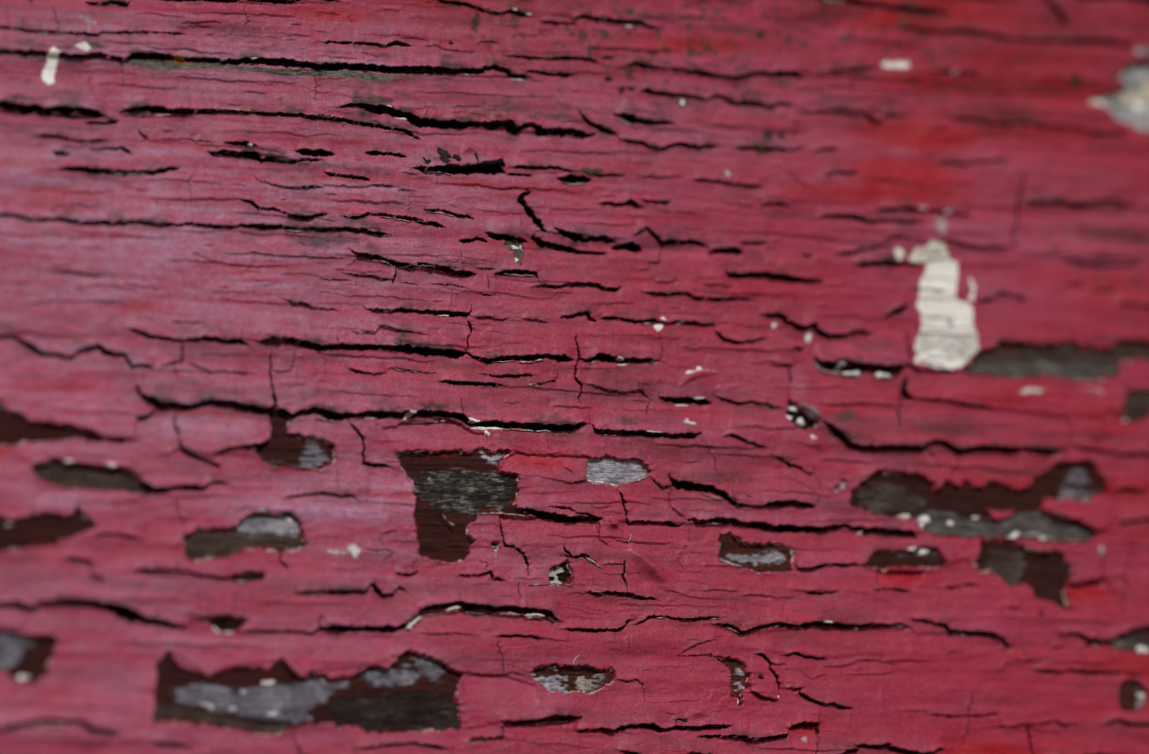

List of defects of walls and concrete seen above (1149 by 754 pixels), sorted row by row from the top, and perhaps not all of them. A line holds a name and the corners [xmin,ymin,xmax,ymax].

crack [166,0,301,8]
crack [438,0,664,29]
crack [0,7,910,125]
crack [0,100,1149,677]
peeling [254,406,336,472]
peeling [0,507,96,552]
peeling [183,509,307,561]
peeling [394,448,528,564]
peeling [833,460,1105,609]
peeling [153,651,462,736]
crack [502,652,897,754]
crack [842,692,1149,754]